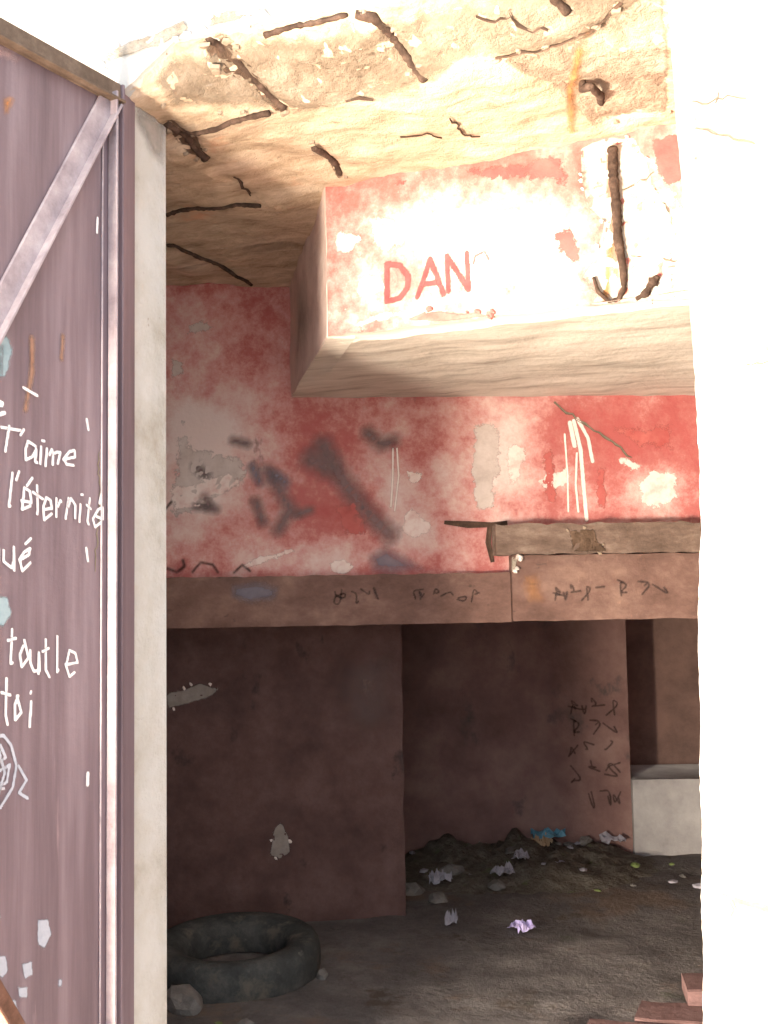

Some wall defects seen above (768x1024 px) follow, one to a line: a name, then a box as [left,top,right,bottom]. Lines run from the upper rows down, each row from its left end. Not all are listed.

spalling [98,0,672,125]
rust [567,50,581,133]
spalling [166,120,208,163]
peeling [335,217,410,253]
peeling [437,210,549,287]
rust [603,219,618,297]
spalling [578,135,690,305]
peeling [170,420,247,517]
peeling [471,423,526,510]
peeling [619,457,677,509]
spalling [166,683,216,711]
spalling [270,824,292,860]